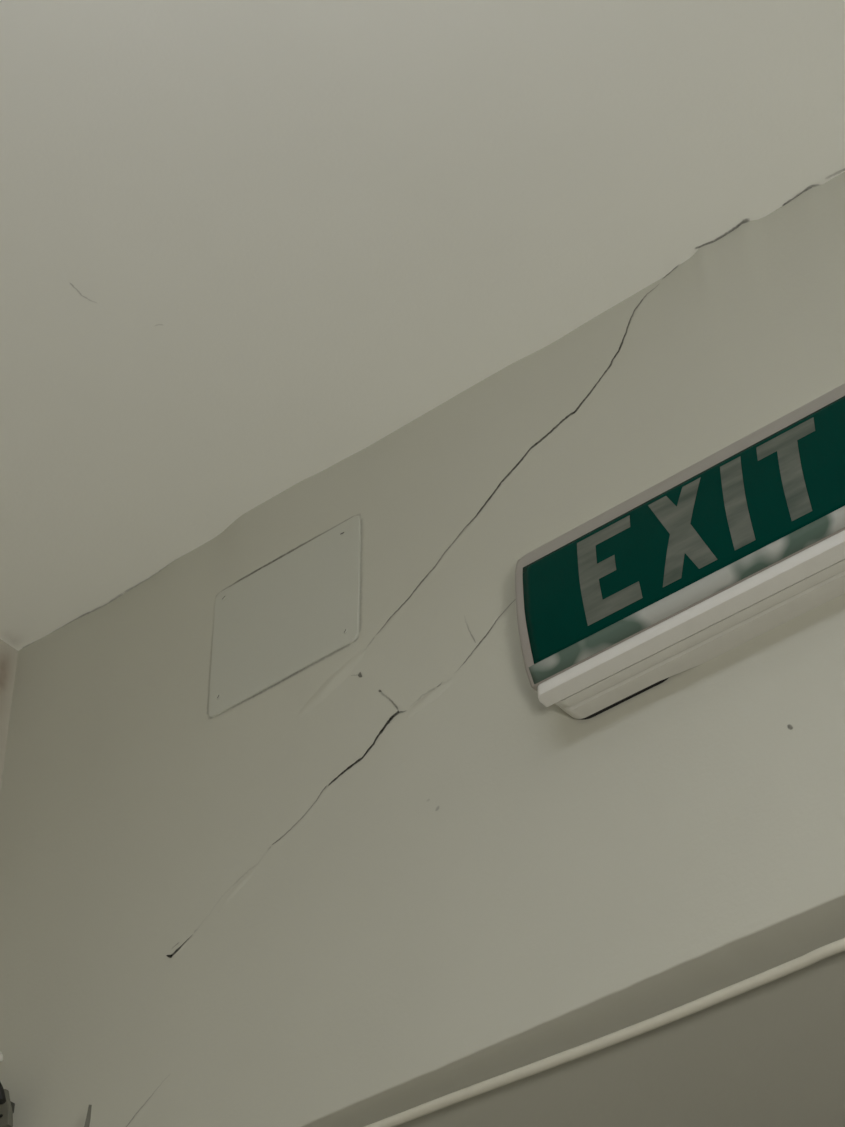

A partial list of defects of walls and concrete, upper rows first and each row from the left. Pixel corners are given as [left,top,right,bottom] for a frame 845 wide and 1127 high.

crack [466,300,642,526]
crack [325,710,401,788]
crack [166,935,194,958]